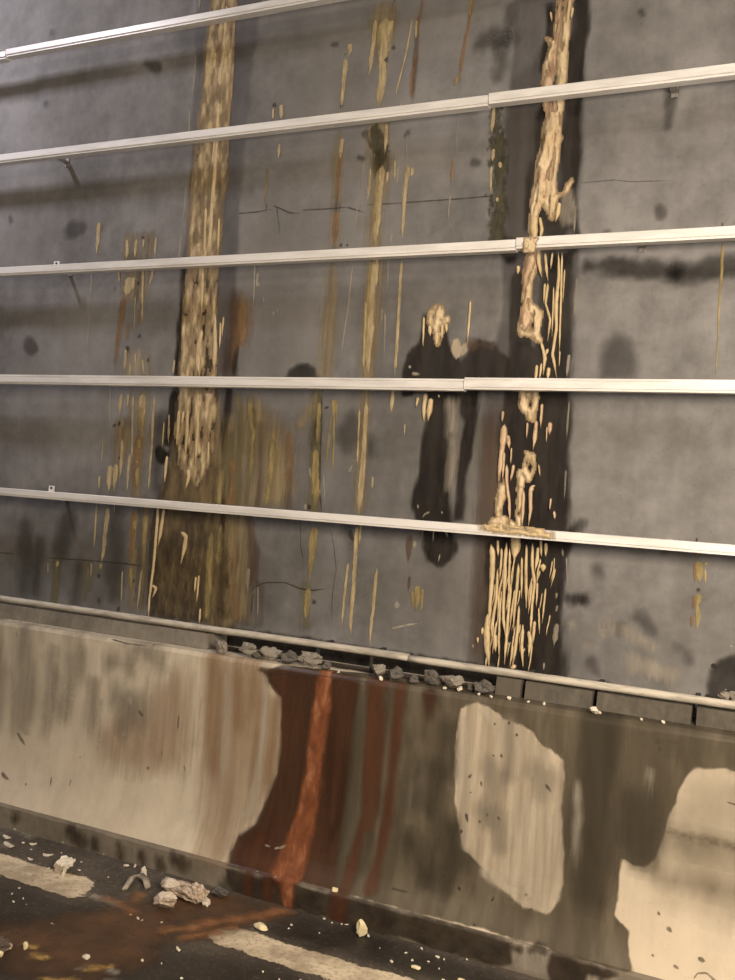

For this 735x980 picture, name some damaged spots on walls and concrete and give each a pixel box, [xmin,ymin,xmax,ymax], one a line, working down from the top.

leakage [193,21,236,130]
leakage [198,0,238,11]
leakage [334,44,352,109]
leakage [368,0,422,106]
leakage [540,0,589,87]
leakage [83,98,735,980]
corrosion [215,668,406,894]
leakage [0,950,25,969]